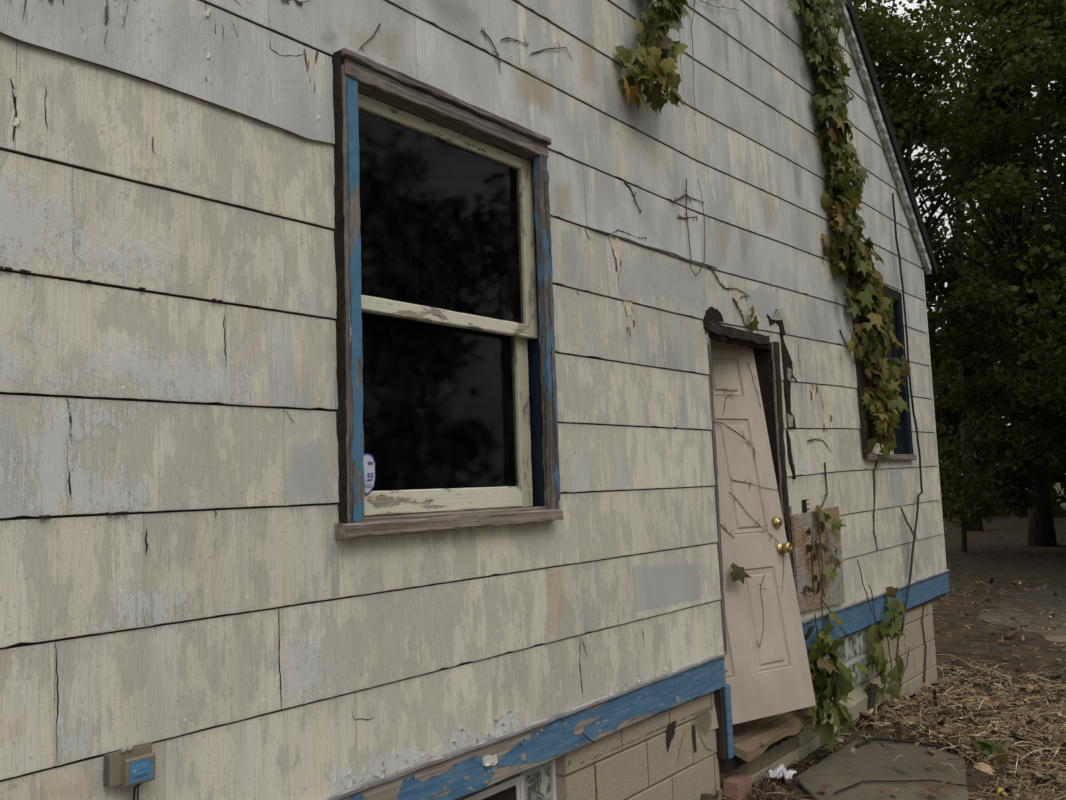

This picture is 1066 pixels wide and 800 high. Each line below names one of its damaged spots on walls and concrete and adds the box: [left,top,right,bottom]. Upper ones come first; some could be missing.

peeling [104,0,135,52]
peeling [304,49,319,73]
peeling [0,164,82,290]
peeling [0,335,260,529]
peeling [98,574,206,632]
peeling [325,657,727,800]